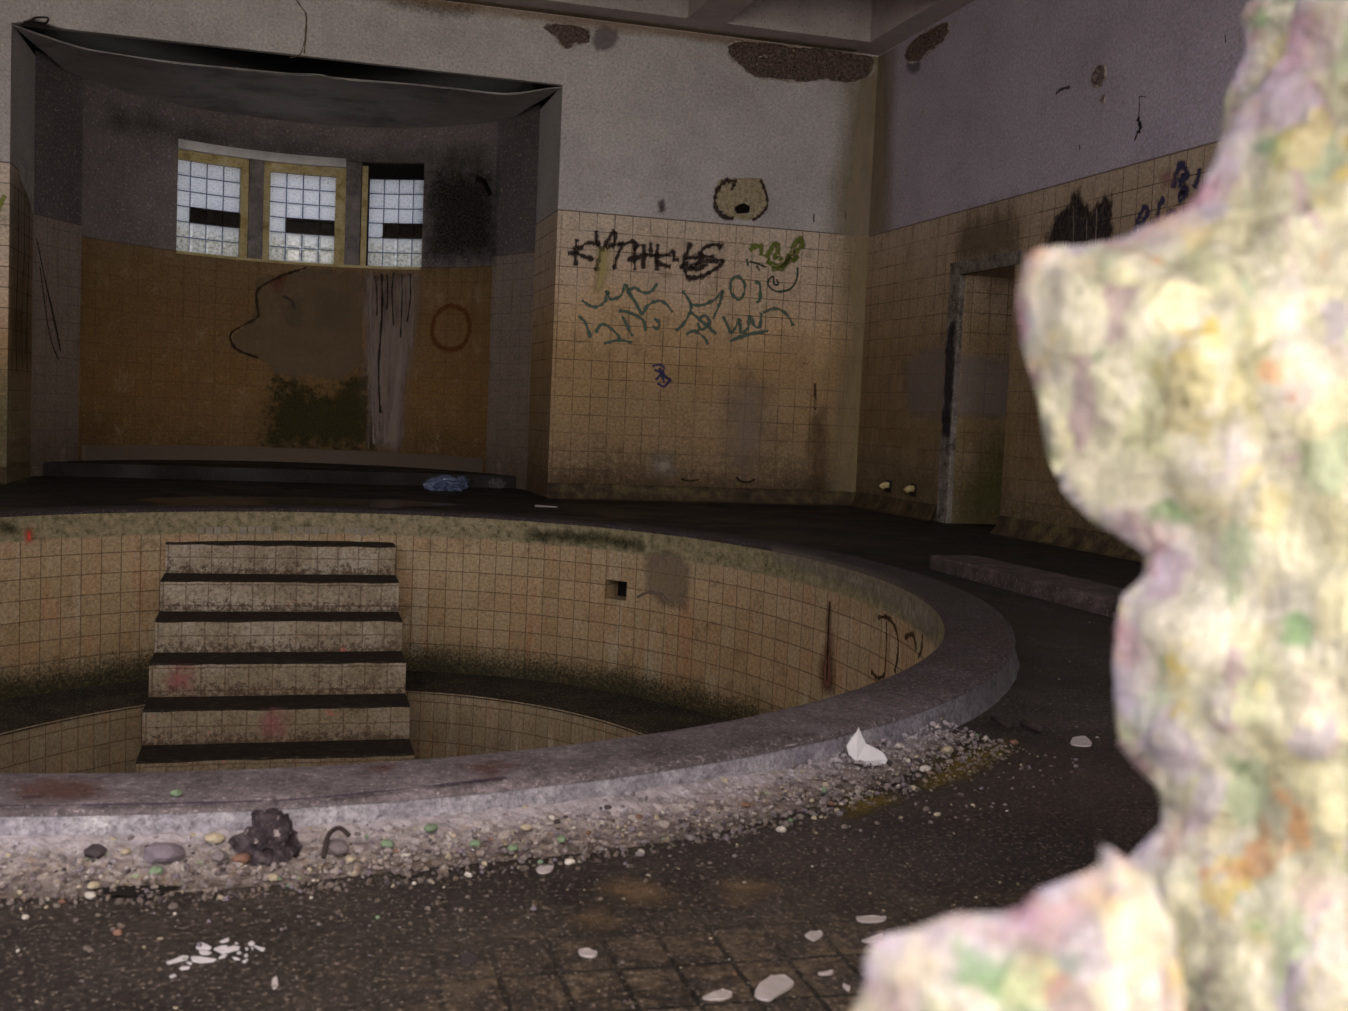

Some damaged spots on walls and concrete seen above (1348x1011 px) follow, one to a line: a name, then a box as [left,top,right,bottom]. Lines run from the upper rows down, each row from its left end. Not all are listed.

spalling [16,16,561,109]
flaking render [543,23,617,50]
flaking render [727,40,877,83]
flaking render [904,22,951,73]
water stain [422,165,497,266]
water stain [361,272,418,450]